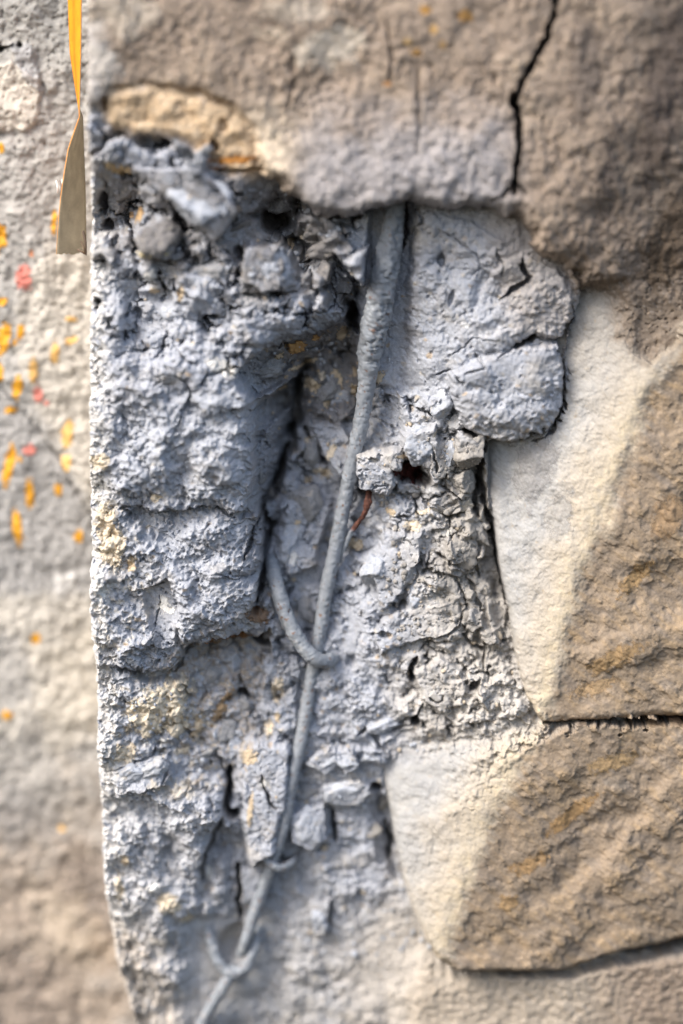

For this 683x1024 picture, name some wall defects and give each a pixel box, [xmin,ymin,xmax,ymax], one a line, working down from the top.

crack [490,0,561,202]
spalling [87,85,534,1024]
crack [261,774,278,811]
crack [200,819,222,882]
crack [236,861,244,919]